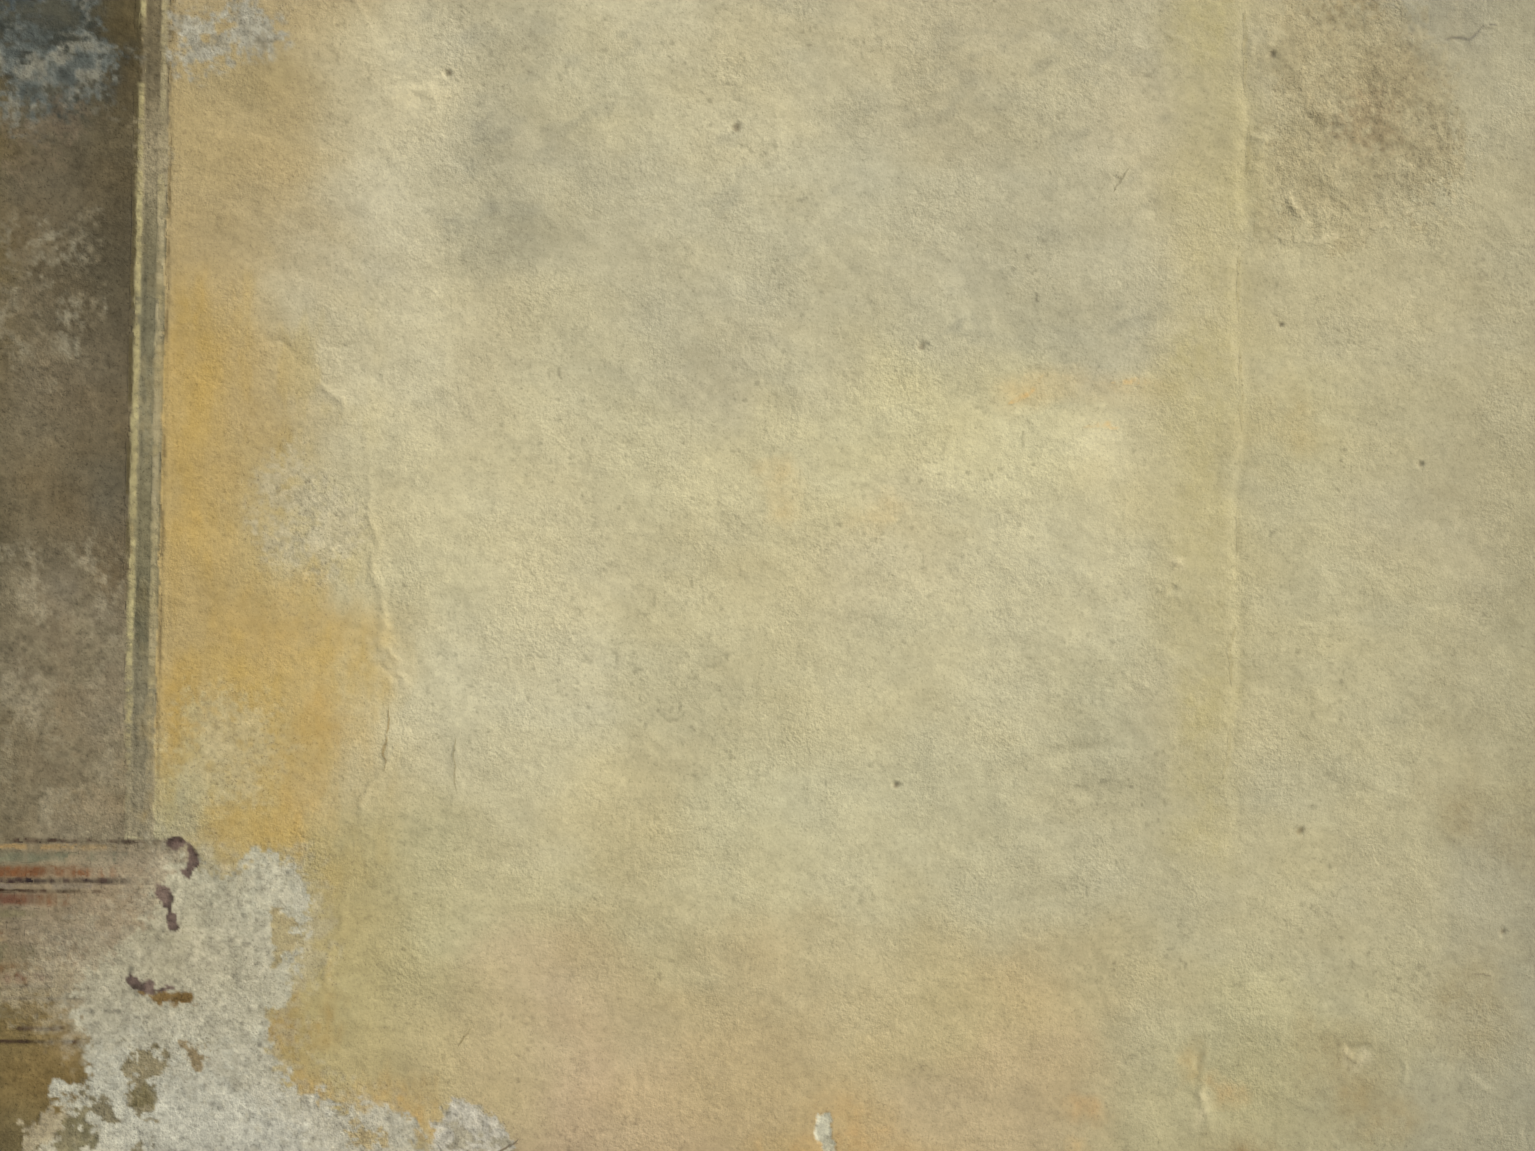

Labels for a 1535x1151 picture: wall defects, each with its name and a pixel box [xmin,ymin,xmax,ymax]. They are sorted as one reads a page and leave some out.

leakage [0,0,337,173]
peeling [0,665,435,1151]
spalling [813,1110,839,1151]